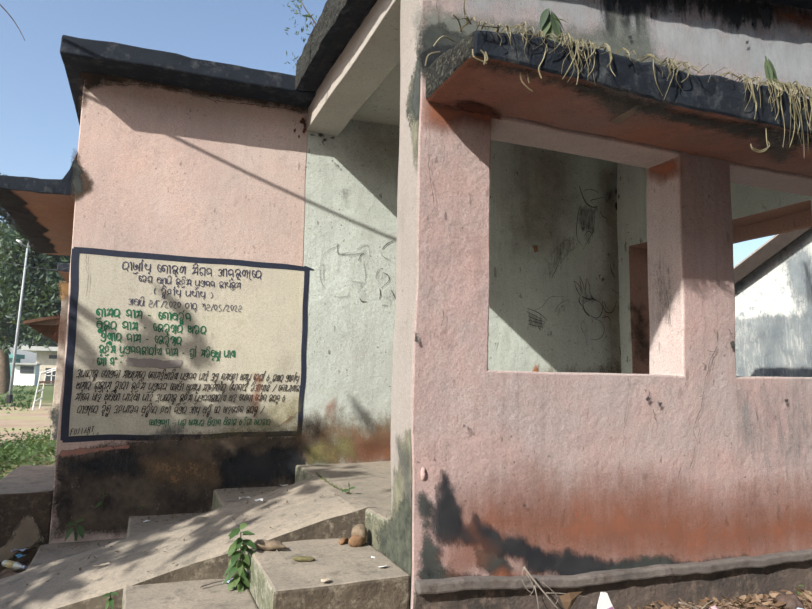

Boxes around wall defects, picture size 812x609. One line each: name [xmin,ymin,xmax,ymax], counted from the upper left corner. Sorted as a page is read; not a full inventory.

damp [416,0,812,97]
damp [480,61,812,147]
crack [690,347,717,467]
damp [49,406,340,538]
damp [415,471,746,580]